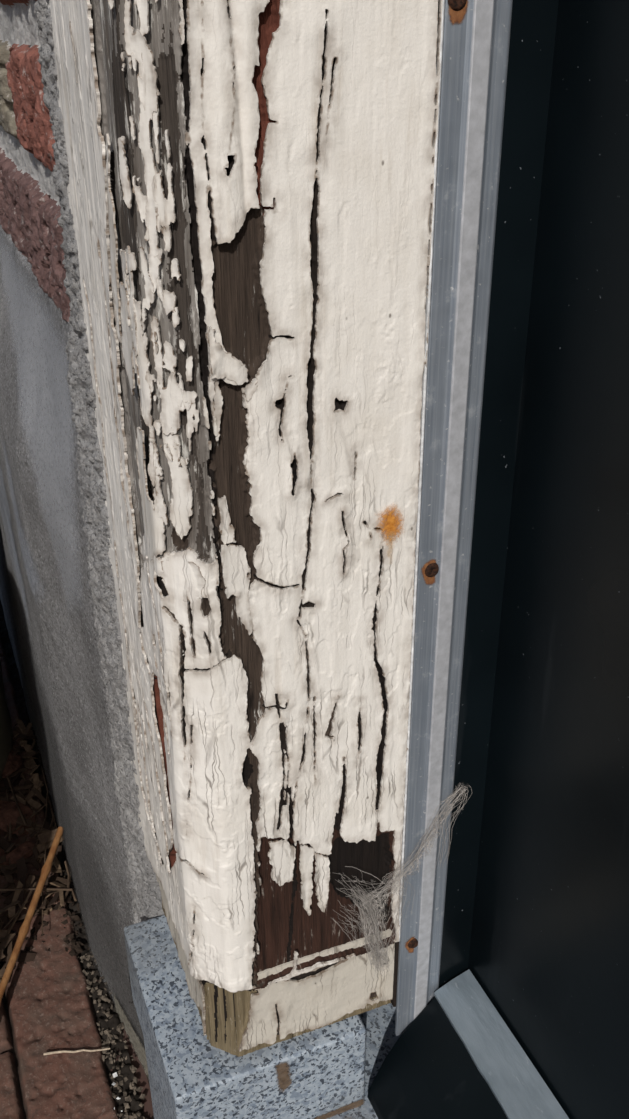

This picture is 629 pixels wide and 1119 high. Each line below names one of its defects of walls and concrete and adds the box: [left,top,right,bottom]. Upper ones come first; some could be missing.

crack [134,0,234,798]
peeling [91,0,396,1057]
crack [253,9,388,962]
corrosion [380,508,402,541]
corrosion [449,0,468,24]